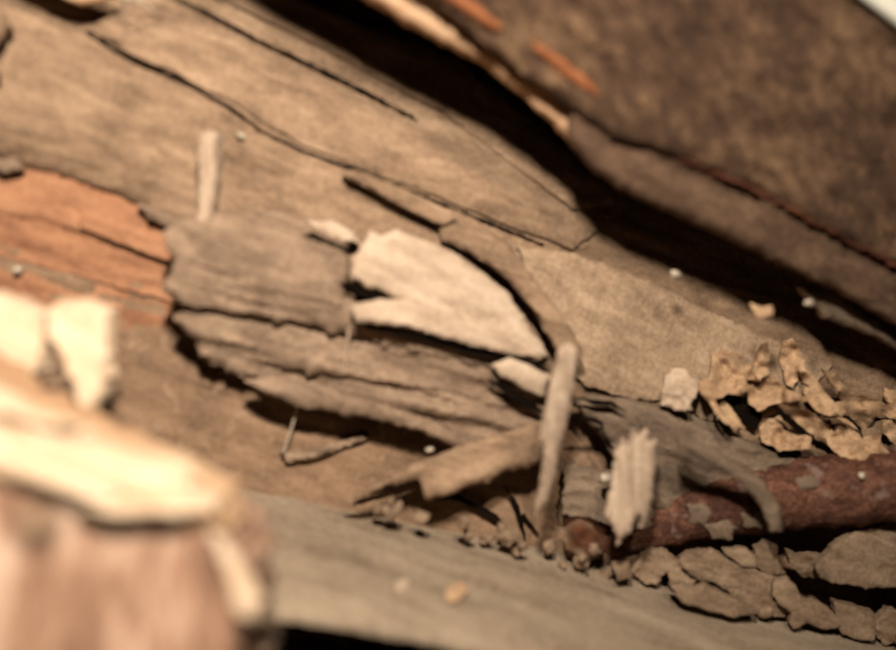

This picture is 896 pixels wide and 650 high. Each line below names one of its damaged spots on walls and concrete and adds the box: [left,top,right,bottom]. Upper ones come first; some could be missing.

crack [86,31,544,245]
crack [298,232,354,253]
peeling [0,0,896,501]
peeling [562,462,612,525]
rust [568,478,769,556]
peeling [571,390,836,530]
rust [752,444,896,531]